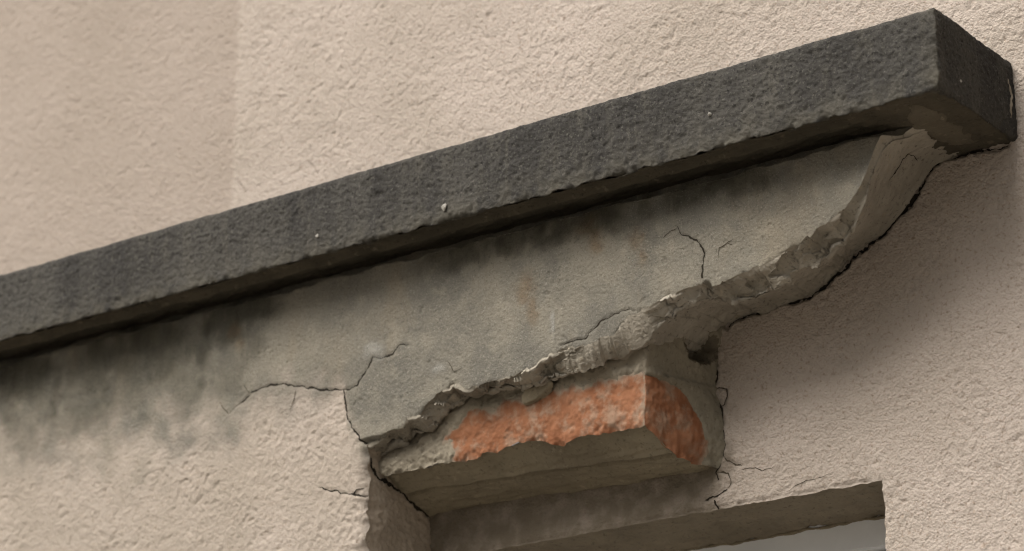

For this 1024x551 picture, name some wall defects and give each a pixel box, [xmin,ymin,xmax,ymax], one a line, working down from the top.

crack [663,226,733,278]
flaking render [701,179,869,303]
crack [789,146,1008,305]
crack [221,344,430,518]
peeling [368,304,663,476]
crack [706,370,774,509]